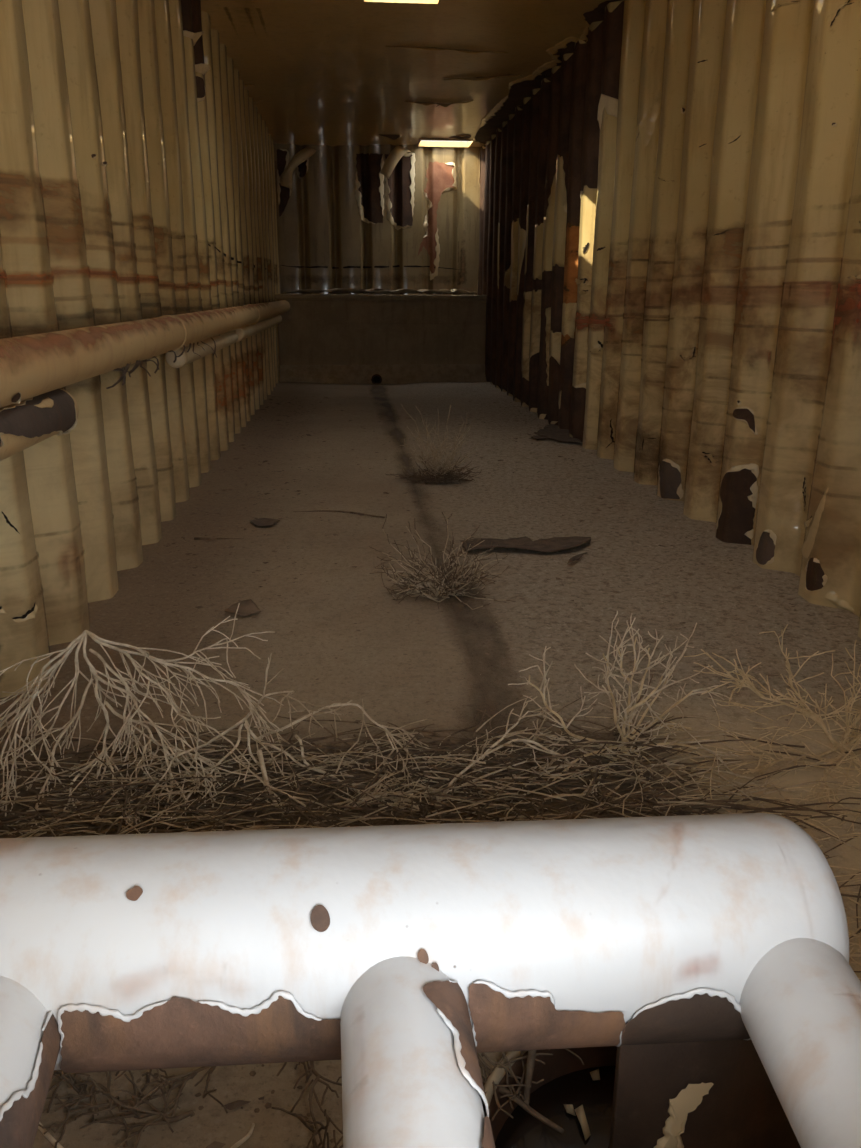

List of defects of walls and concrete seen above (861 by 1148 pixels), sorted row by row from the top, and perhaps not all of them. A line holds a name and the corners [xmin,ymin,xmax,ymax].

peeling [355,134,457,281]
peeling [449,0,624,442]
corrosion [0,271,60,286]
corrosion [87,268,263,290]
peeling [0,389,77,449]
peeling [733,400,758,435]
crack [2,512,20,534]
peeling [716,463,777,565]
peeling [805,558,828,591]
crack [0,603,38,623]
peeling [0,991,341,1148]
peeling [417,949,751,1148]